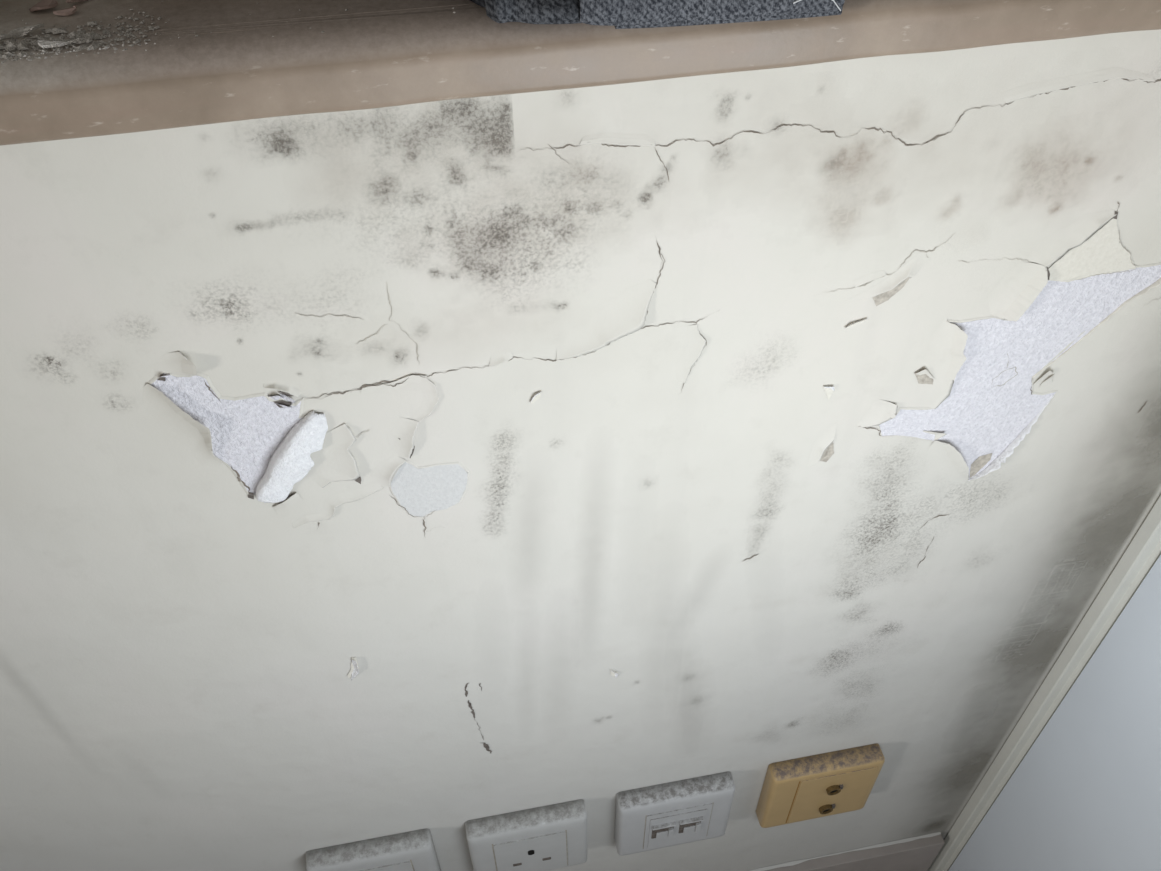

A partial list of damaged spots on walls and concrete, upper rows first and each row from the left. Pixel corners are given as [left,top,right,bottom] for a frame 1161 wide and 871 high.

leakage [443,102,511,154]
crack [519,67,1161,180]
leakage [463,212,518,277]
crack [819,244,1041,295]
crack [294,239,707,400]
peeling [843,203,1161,486]
peeling [143,351,470,533]
peeling [805,421,838,469]
leakage [1070,400,1161,573]
leakage [1004,609,1073,676]
leakage [949,751,993,790]